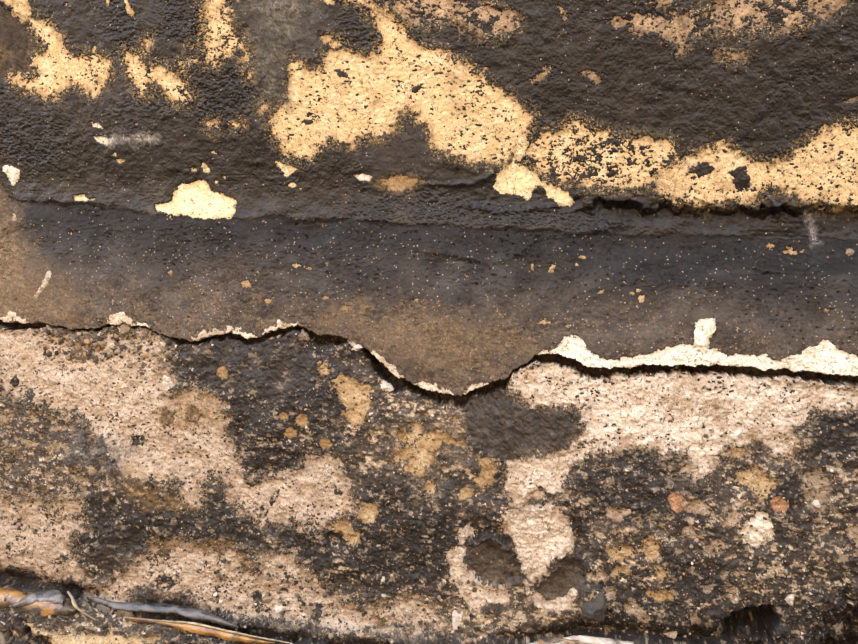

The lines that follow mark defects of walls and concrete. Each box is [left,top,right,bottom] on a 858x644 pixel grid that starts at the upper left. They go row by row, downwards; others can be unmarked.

peeling [0,0,858,220]
crack [0,311,858,408]
spalling [458,318,858,625]